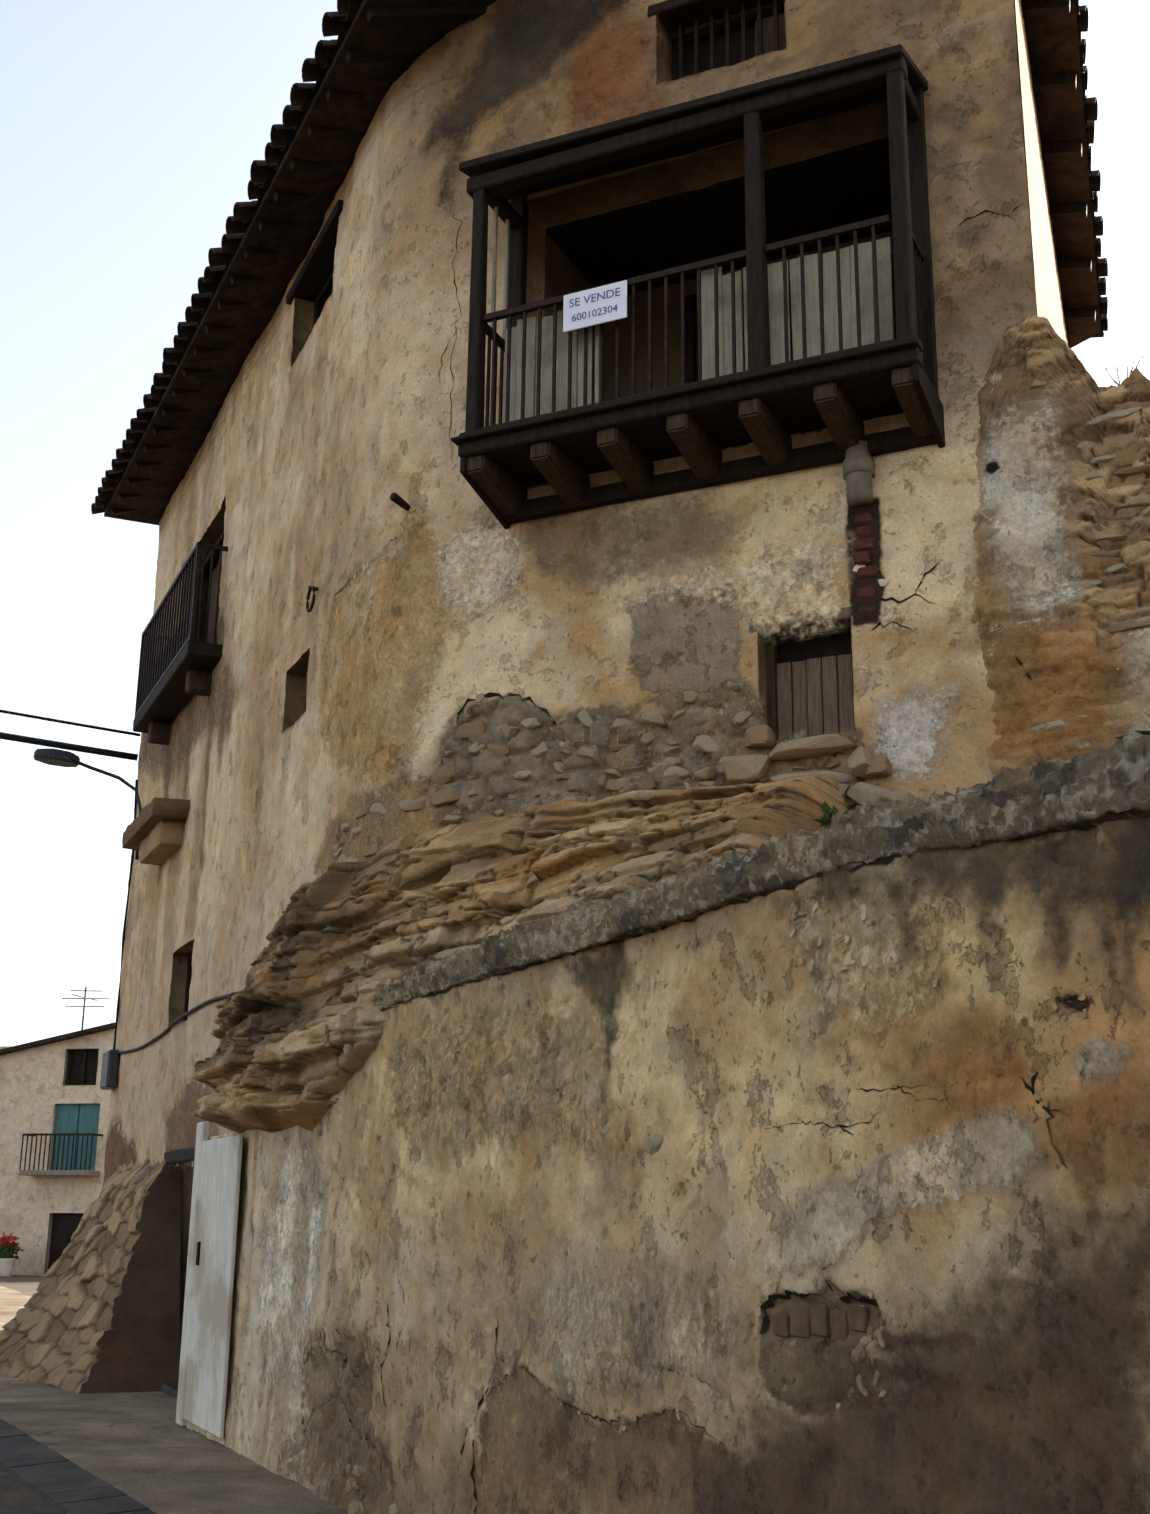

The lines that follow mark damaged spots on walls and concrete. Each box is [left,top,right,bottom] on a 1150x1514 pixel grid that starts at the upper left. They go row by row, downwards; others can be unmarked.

water stain [425,0,624,195]
crack [960,204,1022,225]
crack [870,562,939,631]
spalling [456,692,557,725]
water stain [971,589,1123,761]
water stain [781,816,1150,962]
hole [1052,993,1090,1019]
crack [764,1072,1068,1169]
crack [460,1320,506,1514]
crack [608,1359,724,1403]
spalling [756,1262,890,1414]
water stain [692,1198,1150,1514]